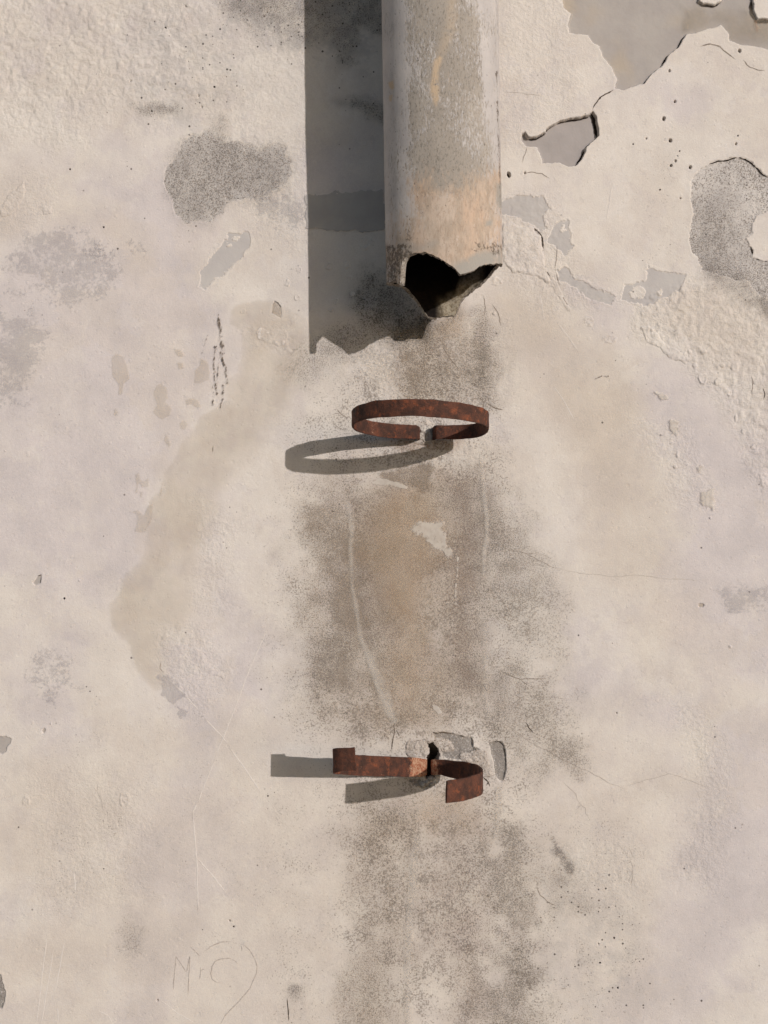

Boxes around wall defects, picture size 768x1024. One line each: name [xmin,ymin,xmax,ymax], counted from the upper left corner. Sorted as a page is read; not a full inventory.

flaking render [559,0,768,93]
flaking render [160,126,296,292]
flaking render [502,97,768,309]
water stain [292,273,489,399]
water stain [307,499,389,721]
flaking render [423,728,510,785]